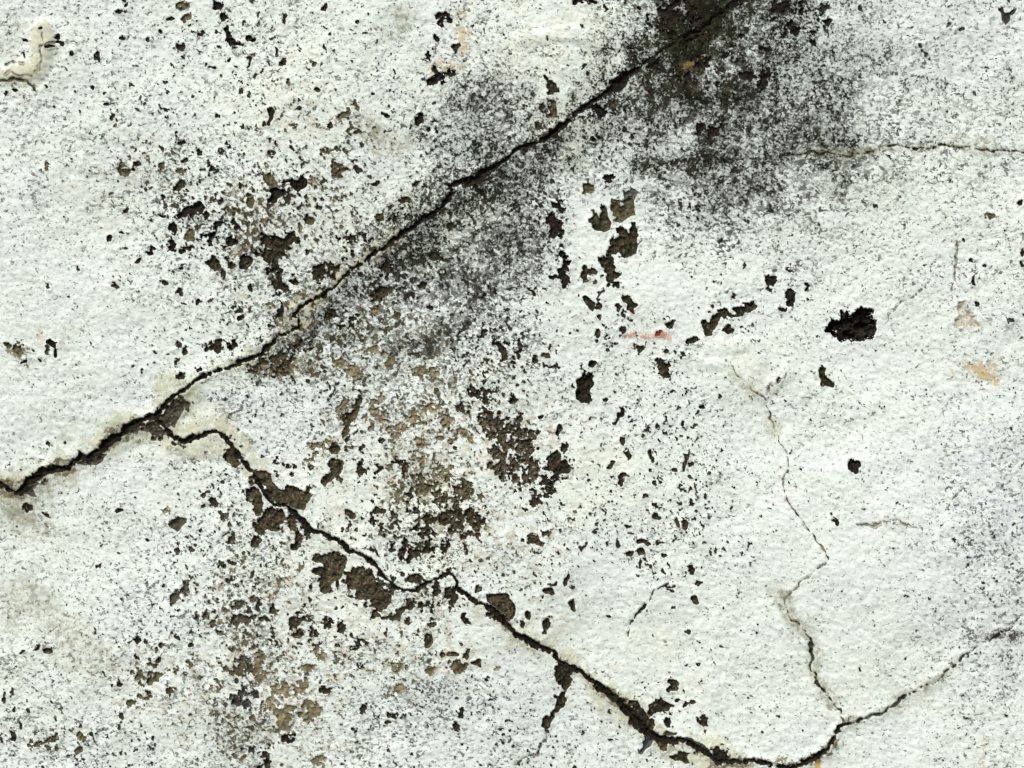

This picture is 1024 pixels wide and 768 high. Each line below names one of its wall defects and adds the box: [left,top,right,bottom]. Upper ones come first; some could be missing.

peeling [241,335,320,380]
crack [0,0,745,505]
peeling [527,188,639,351]
leakage [245,0,949,379]
crack [638,138,1024,170]
spalling [824,306,877,342]
crack [746,374,829,569]
peeling [102,631,194,730]
peeling [152,579,190,609]
peeling [189,358,576,768]
crack [154,415,923,768]
crack [934,645,981,684]